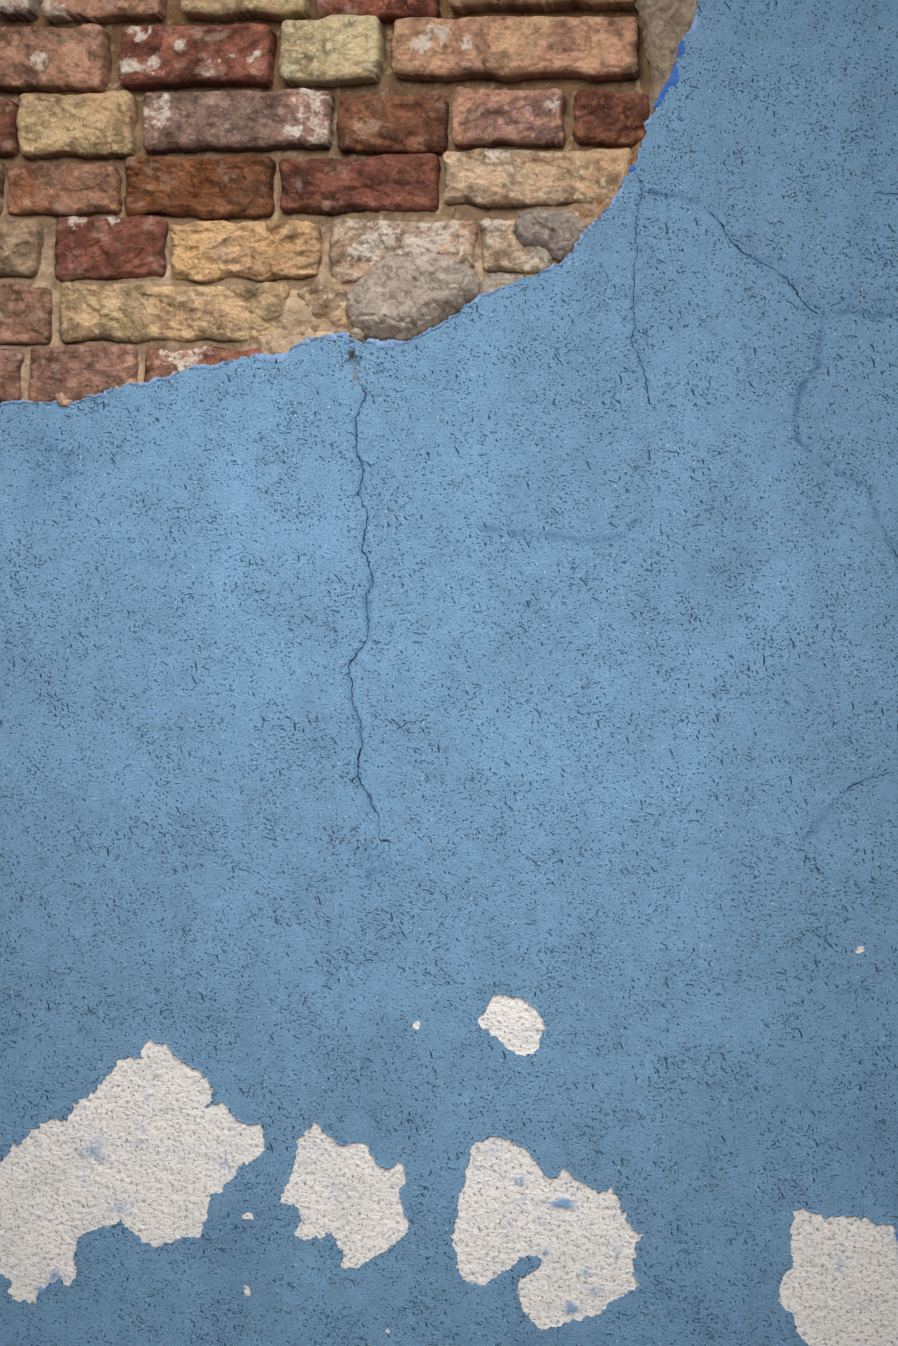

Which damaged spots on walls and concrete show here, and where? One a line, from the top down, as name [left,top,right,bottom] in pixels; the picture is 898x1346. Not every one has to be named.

spalling [0,0,701,407]
crack [340,363,396,844]
peeling [478,991,549,1056]
peeling [0,1036,265,1303]
peeling [279,1120,411,1269]
peeling [450,1134,646,1331]
peeling [778,1208,898,1346]